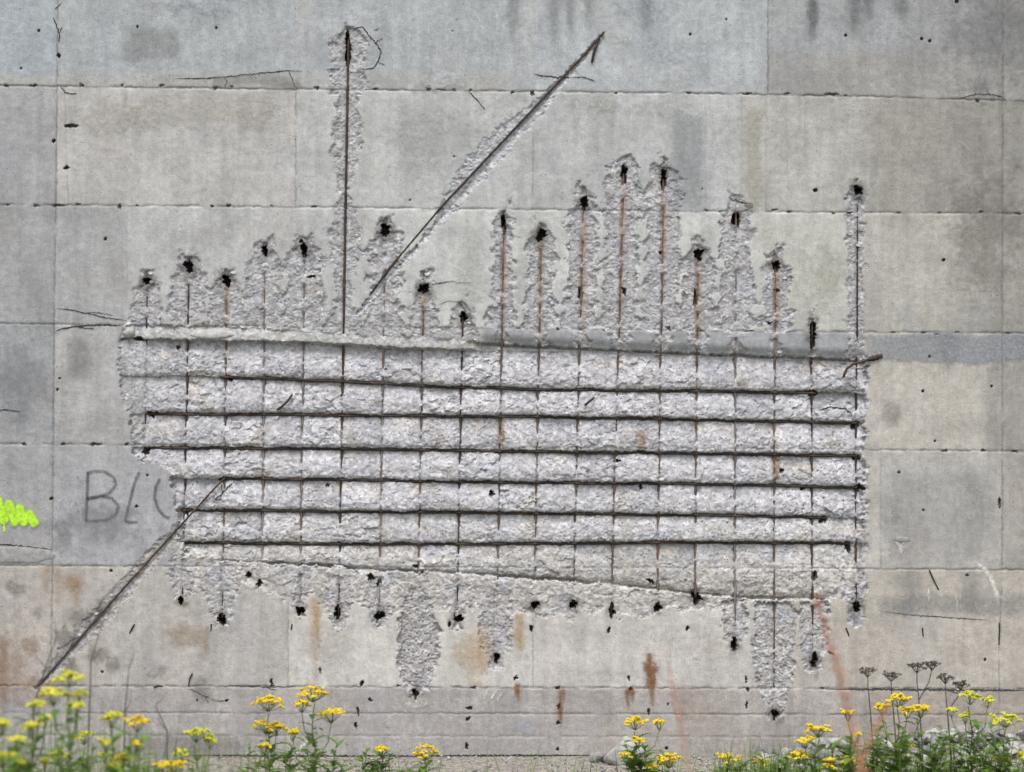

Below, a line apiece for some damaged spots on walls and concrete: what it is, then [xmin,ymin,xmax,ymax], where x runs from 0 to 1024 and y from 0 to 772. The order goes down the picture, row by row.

spalling [32,22,883,723]
rust [645,653,658,698]